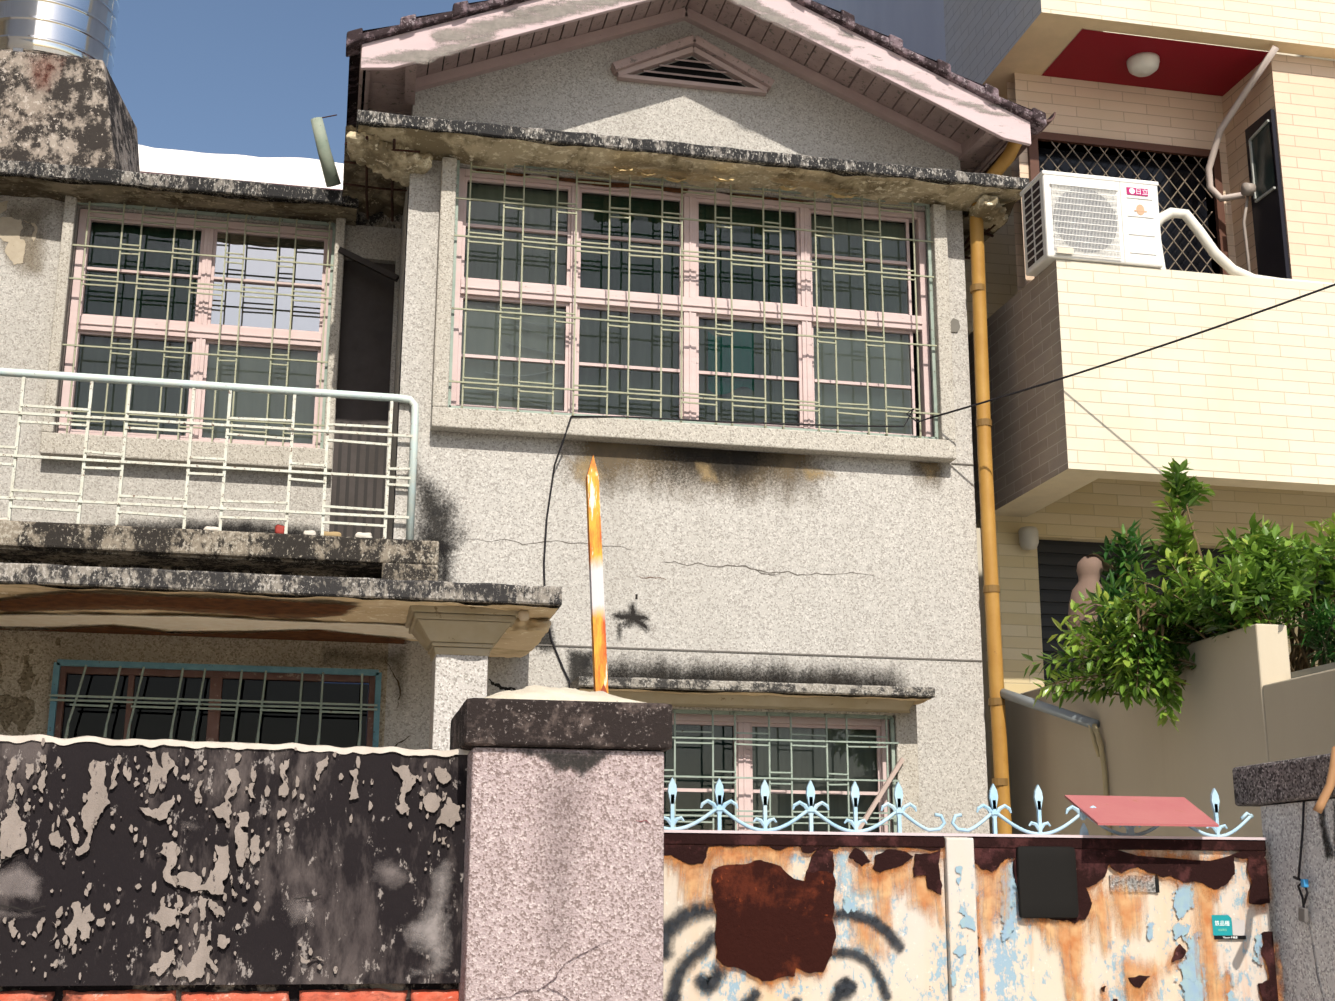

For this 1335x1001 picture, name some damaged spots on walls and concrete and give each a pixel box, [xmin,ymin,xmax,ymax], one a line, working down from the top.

peeling [0,201,38,265]
leakage [564,440,823,497]
leakage [415,473,463,581]
crack [477,539,873,580]
peeling [0,615,416,646]
leakage [569,651,899,686]
peeling [0,738,374,984]
peeling [391,762,468,871]
rust [664,845,943,987]
rust [974,848,1018,1001]
rust [1025,849,1271,1001]
rust [1258,931,1281,1001]